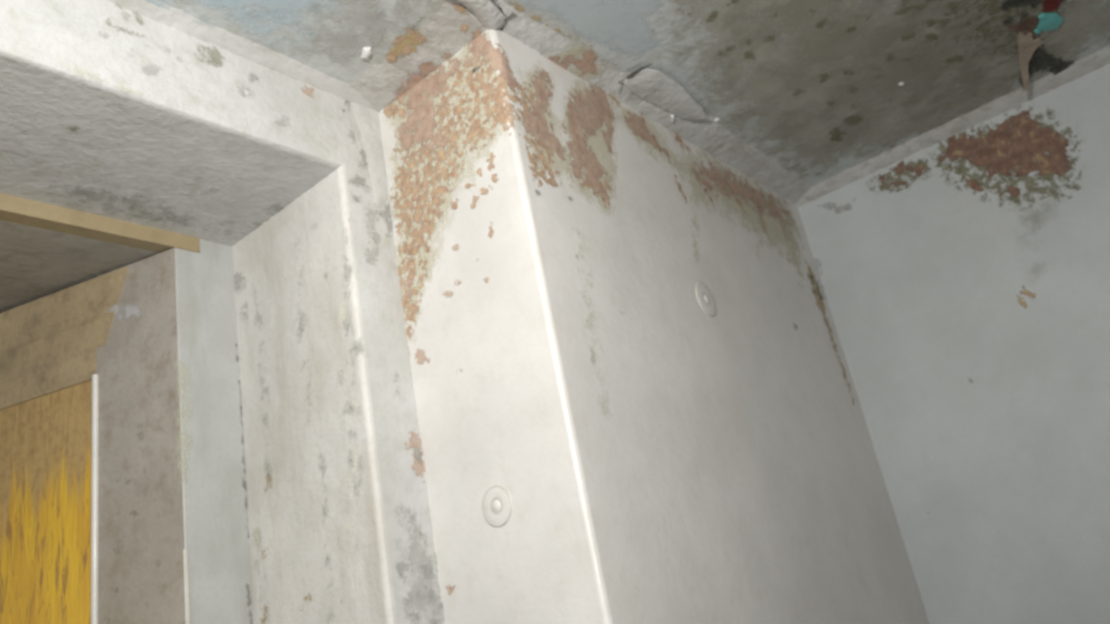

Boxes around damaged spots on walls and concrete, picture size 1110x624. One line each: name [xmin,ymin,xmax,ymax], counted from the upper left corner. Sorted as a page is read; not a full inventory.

crack [600,59,652,85]
water stain [677,0,1110,170]